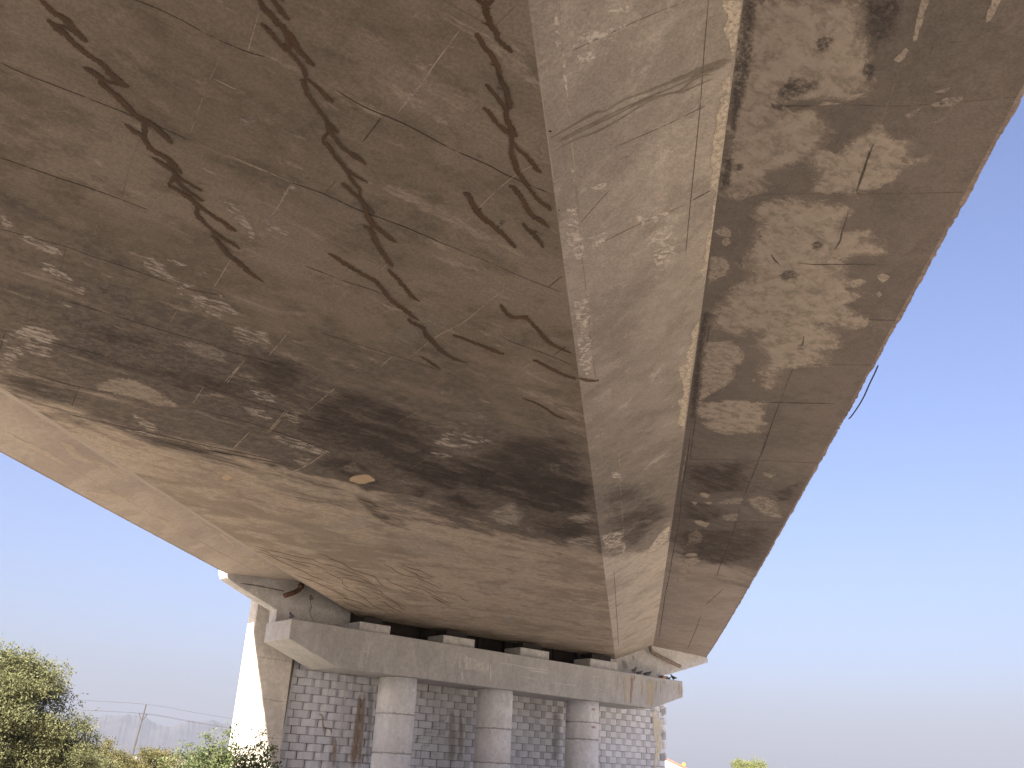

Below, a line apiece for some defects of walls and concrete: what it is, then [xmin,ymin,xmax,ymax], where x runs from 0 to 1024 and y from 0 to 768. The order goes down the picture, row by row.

crack [39,0,264,283]
crack [258,0,504,369]
crack [463,0,552,249]
water stain [539,3,756,153]
efflorescence [244,390,277,420]
crack [499,304,599,382]
water stain [692,314,710,417]
spalling [349,474,375,484]
water stain [272,389,626,561]
crack [254,545,468,619]
water stain [648,525,670,552]
corrosion [351,698,365,762]